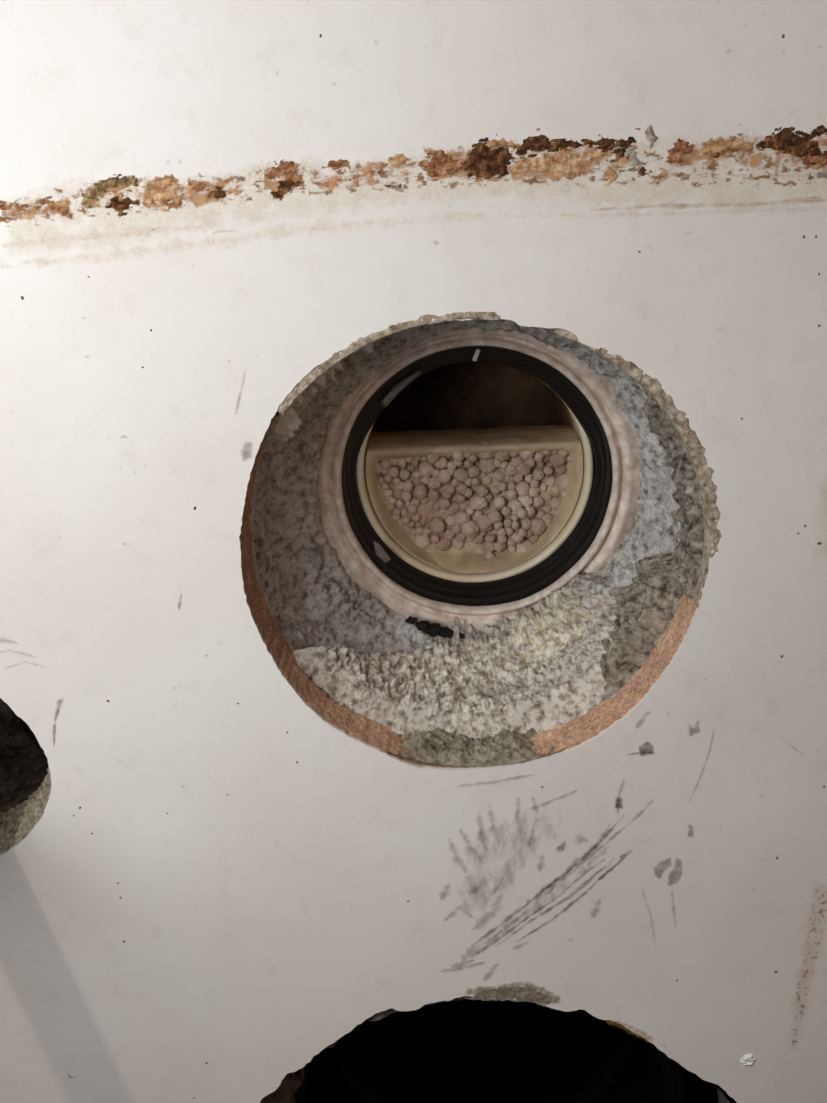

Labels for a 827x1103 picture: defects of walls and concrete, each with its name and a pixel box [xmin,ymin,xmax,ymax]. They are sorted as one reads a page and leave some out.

rust [0,125,827,227]